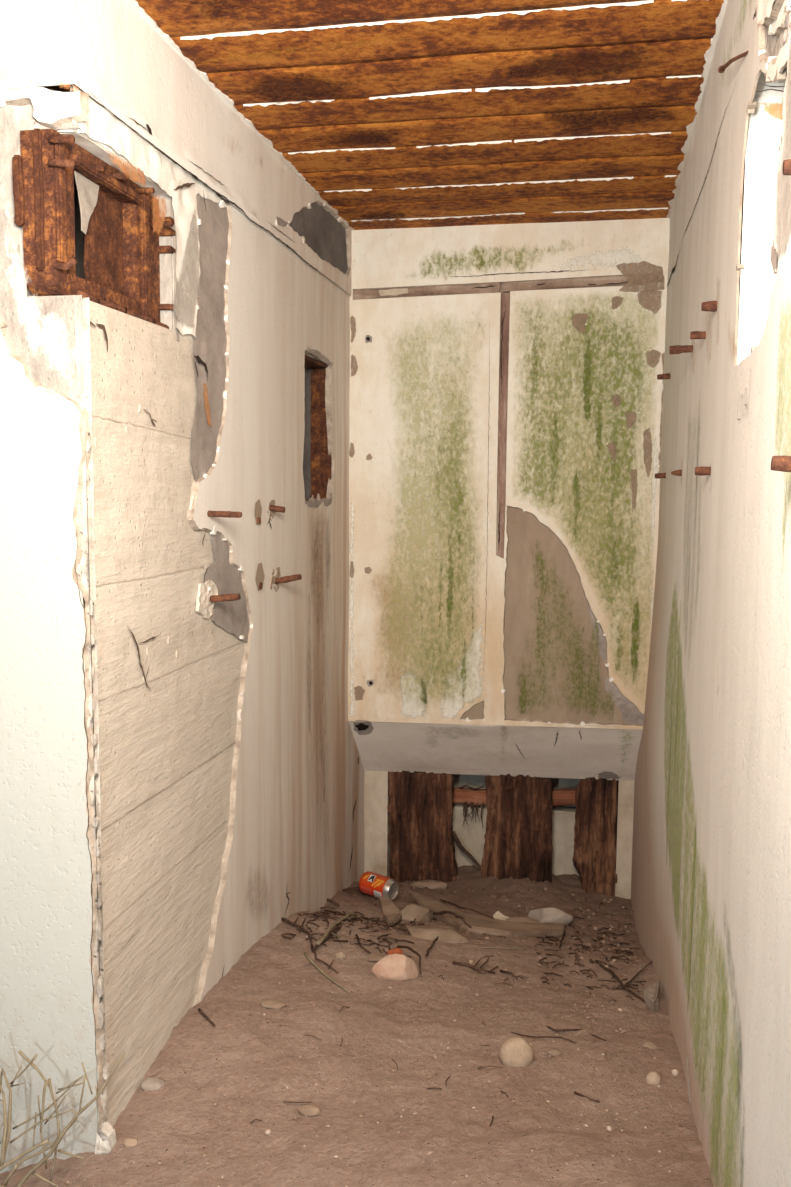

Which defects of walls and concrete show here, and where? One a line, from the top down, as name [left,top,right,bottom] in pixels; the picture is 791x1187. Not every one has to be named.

rust [109,154,145,185]
rust [152,197,167,232]
flaking render [276,202,348,273]
peeling [612,261,667,314]
crack [667,82,737,286]
flaking render [758,2,791,274]
damp [583,341,615,458]
damp [651,440,659,550]
flaking render [0,105,254,1155]
damp [441,616,483,718]
flaking render [501,507,644,726]
damp [616,590,654,673]